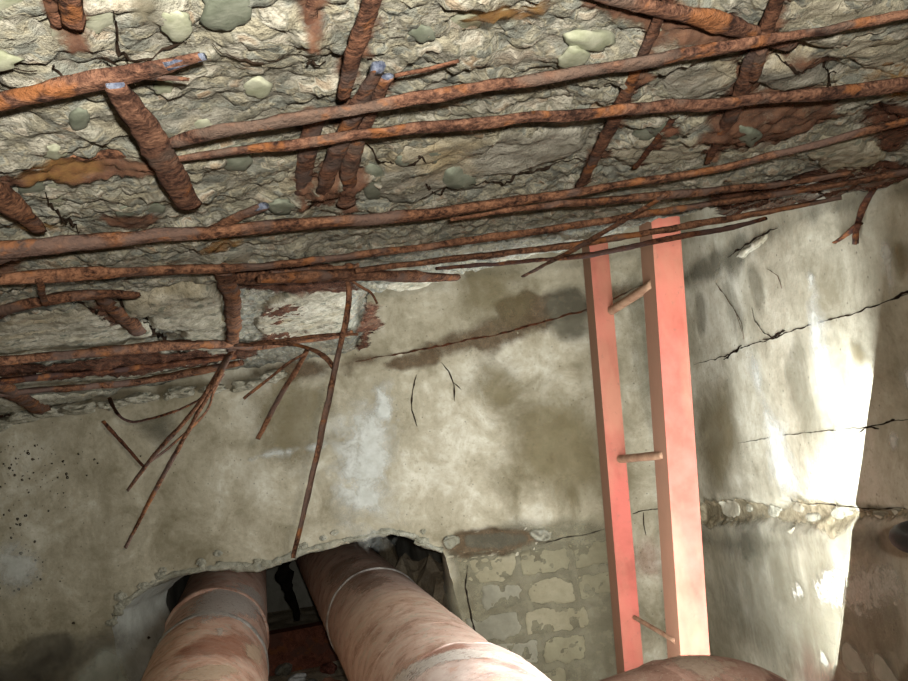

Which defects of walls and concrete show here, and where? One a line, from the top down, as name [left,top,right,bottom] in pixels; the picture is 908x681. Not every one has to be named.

spalling [0,0,908,211]
spalling [0,77,908,277]
rust [701,92,908,216]
rust [0,349,258,381]
rust [246,281,359,347]
rust [357,303,384,351]
crack [701,284,908,363]
spalling [0,212,632,627]
crack [747,419,908,442]
spalling [700,499,908,540]
flaking render [442,523,616,681]
damp [0,635,119,681]